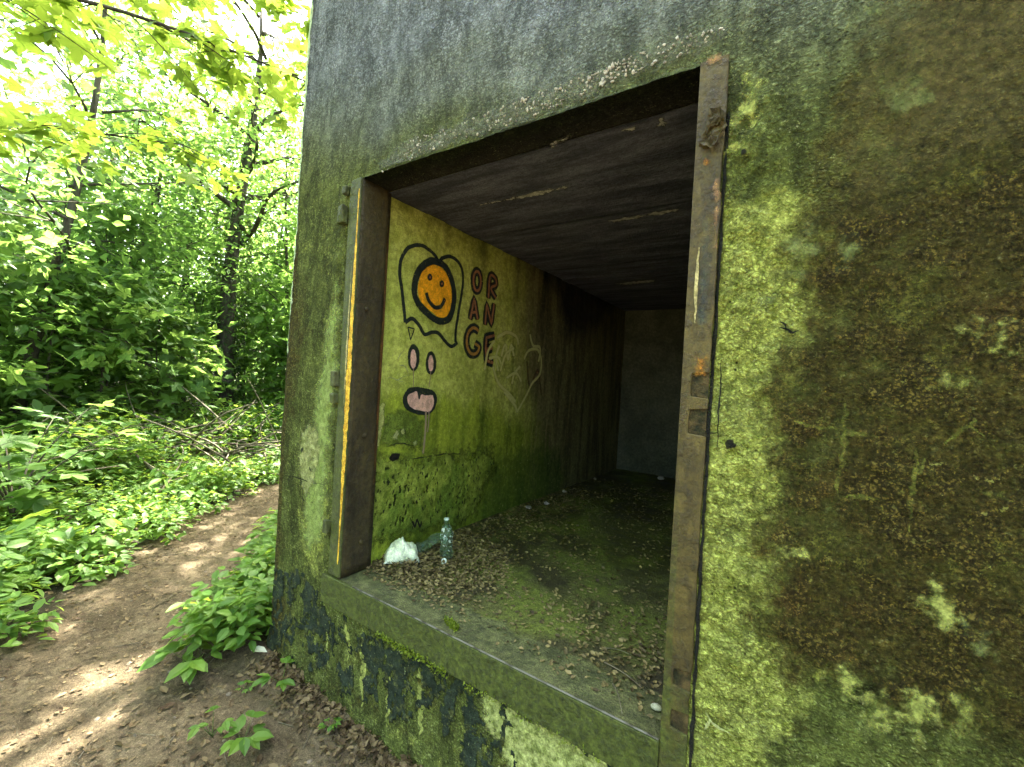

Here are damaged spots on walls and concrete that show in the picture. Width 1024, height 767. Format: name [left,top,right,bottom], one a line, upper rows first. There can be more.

damp [746,139,1024,732]
damp [344,623,366,706]
damp [417,668,425,735]
damp [482,693,611,767]